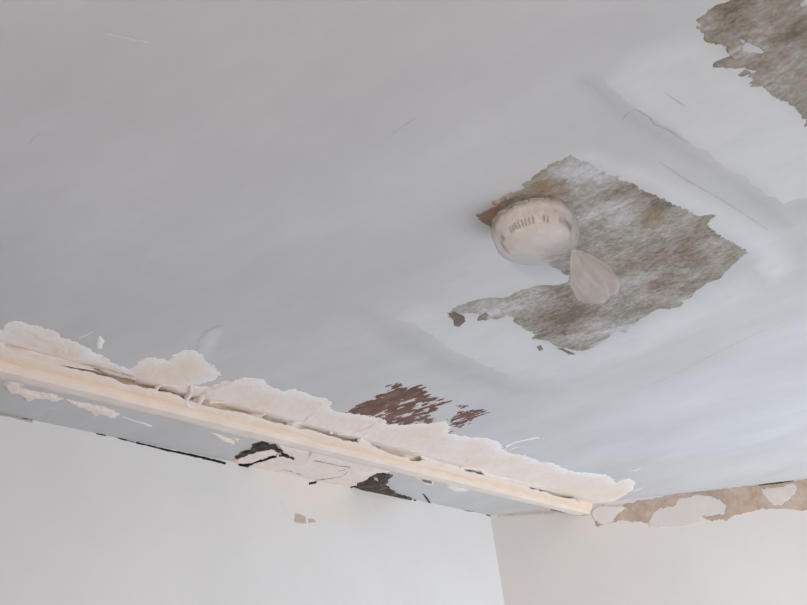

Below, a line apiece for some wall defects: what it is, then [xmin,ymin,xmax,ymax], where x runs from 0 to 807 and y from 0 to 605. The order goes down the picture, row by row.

peeling [696,0,807,127]
peeling [448,155,748,355]
peeling [66,399,120,419]
peeling [345,383,489,434]
spalling [234,441,283,464]
spalling [350,473,416,501]